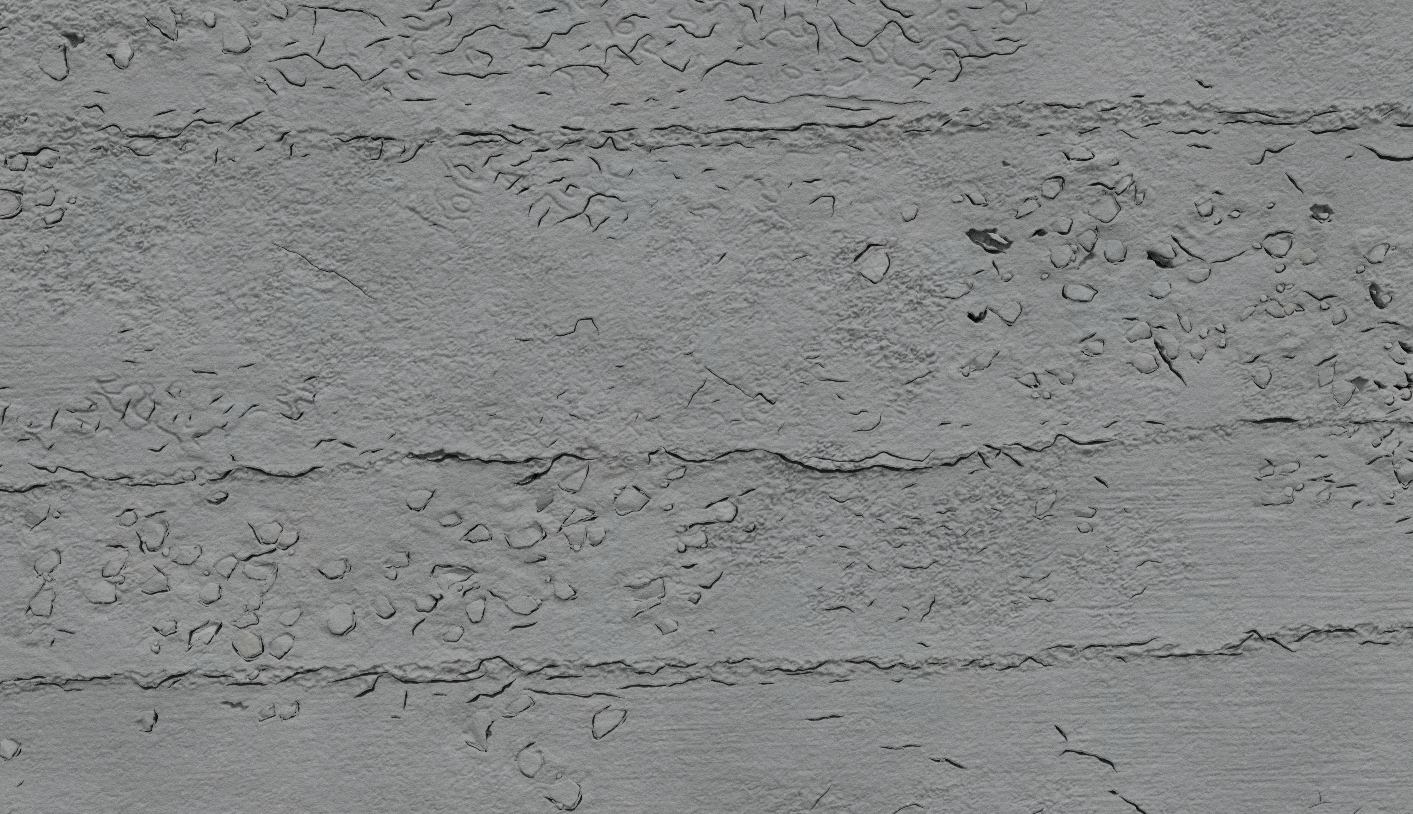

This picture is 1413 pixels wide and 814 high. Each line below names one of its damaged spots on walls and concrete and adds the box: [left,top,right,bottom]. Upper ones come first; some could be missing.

crack [83,0,1030,240]
crack [272,243,376,300]
crack [852,211,918,285]
crack [1018,79,1413,443]
crack [0,317,1165,600]
crack [1012,571,1055,606]
crack [4,746,24,788]
crack [1054,725,1148,814]
crack [1309,793,1361,814]